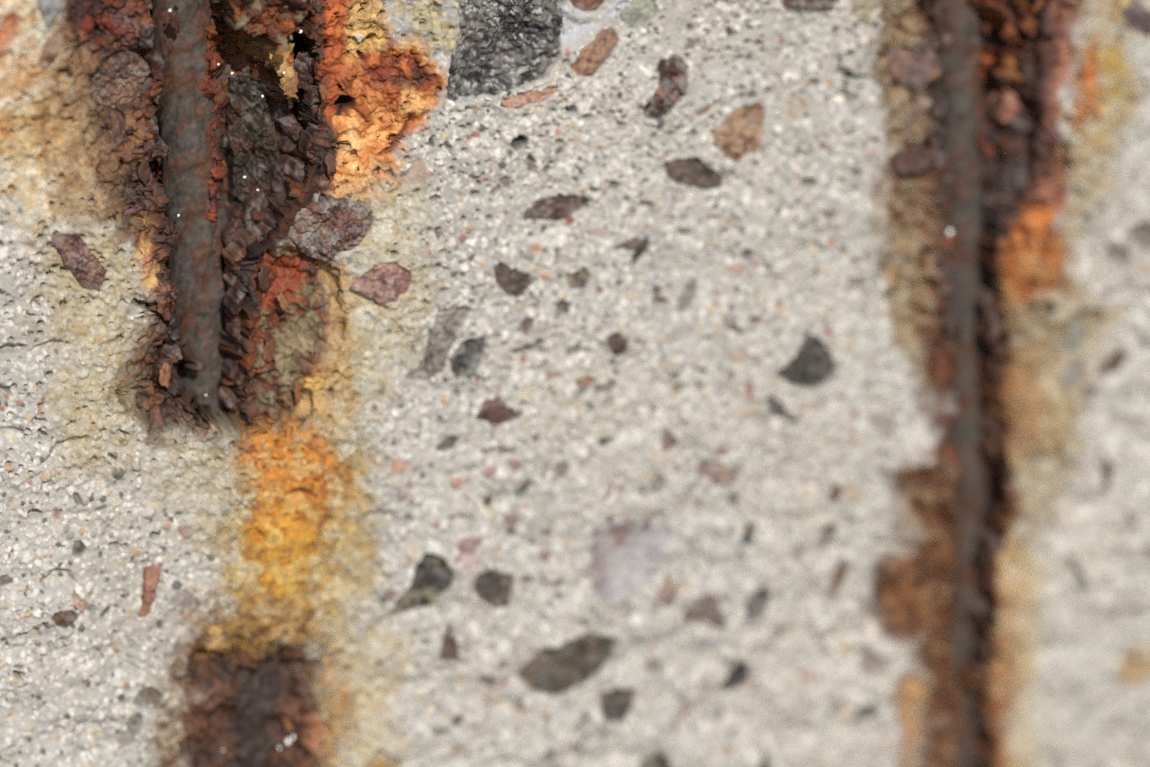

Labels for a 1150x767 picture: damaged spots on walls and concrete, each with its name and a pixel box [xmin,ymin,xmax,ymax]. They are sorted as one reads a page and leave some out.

corrosion [404,0,459,48]
spalling [51,0,448,447]
corrosion [47,235,133,464]
corrosion [152,181,433,654]
spalling [865,0,1094,767]
corrosion [153,697,185,767]
spalling [146,621,349,767]
corrosion [873,551,934,642]
corrosion [989,533,1042,767]